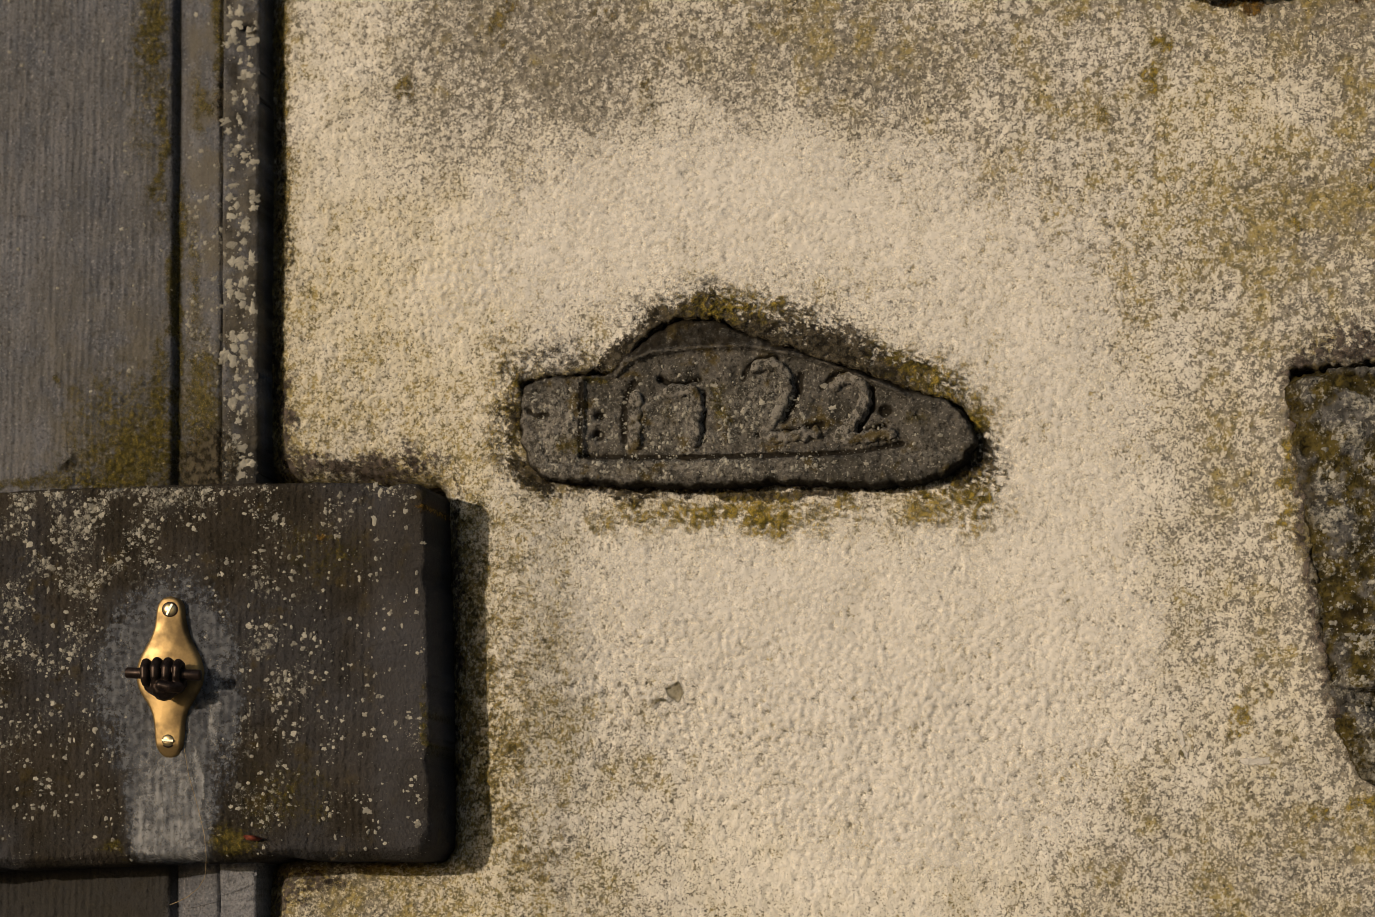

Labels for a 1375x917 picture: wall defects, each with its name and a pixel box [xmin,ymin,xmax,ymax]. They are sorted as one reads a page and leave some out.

water stain [482,278,1017,541]
water stain [89,567,247,865]